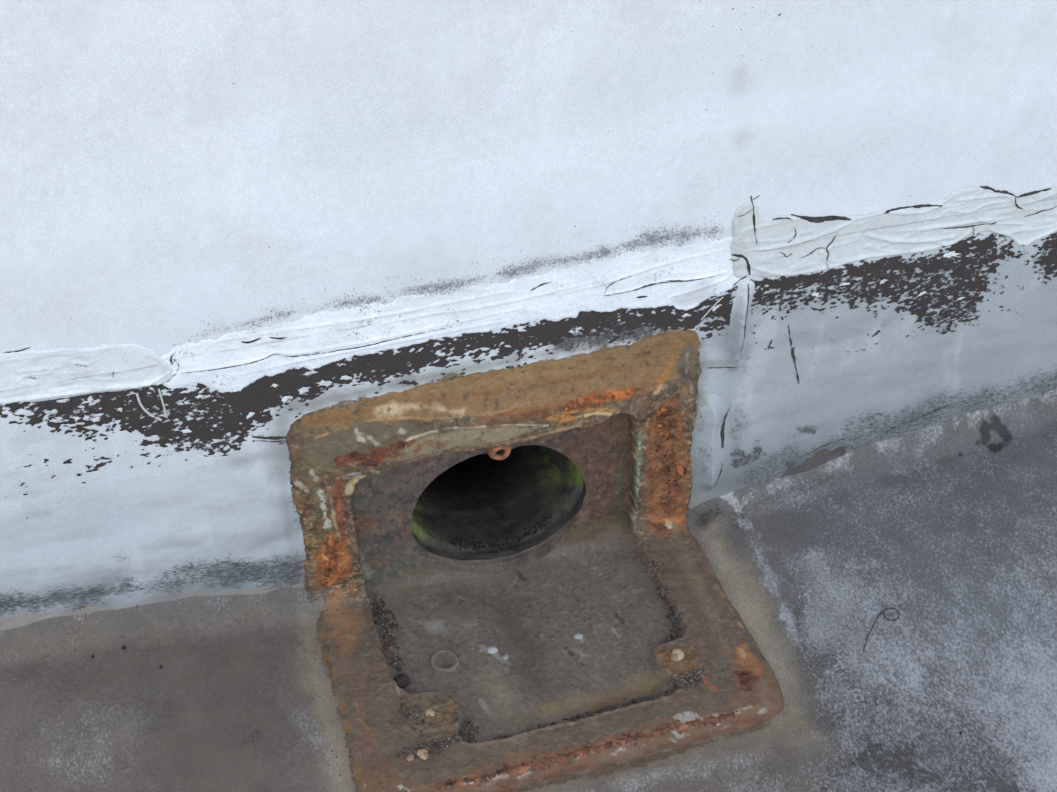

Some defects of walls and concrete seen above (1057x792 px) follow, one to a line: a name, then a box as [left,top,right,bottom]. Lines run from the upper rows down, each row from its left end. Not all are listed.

crack [884,204,997,236]
crack [980,186,1057,217]
crack [604,195,851,369]
peeling [750,233,1057,352]
crack [2,328,445,406]
peeling [0,286,738,484]
crack [768,325,799,384]
rust [334,441,406,467]
rust [647,402,691,519]
water stain [968,411,1011,452]
rust [315,480,349,587]
rust [436,711,765,790]